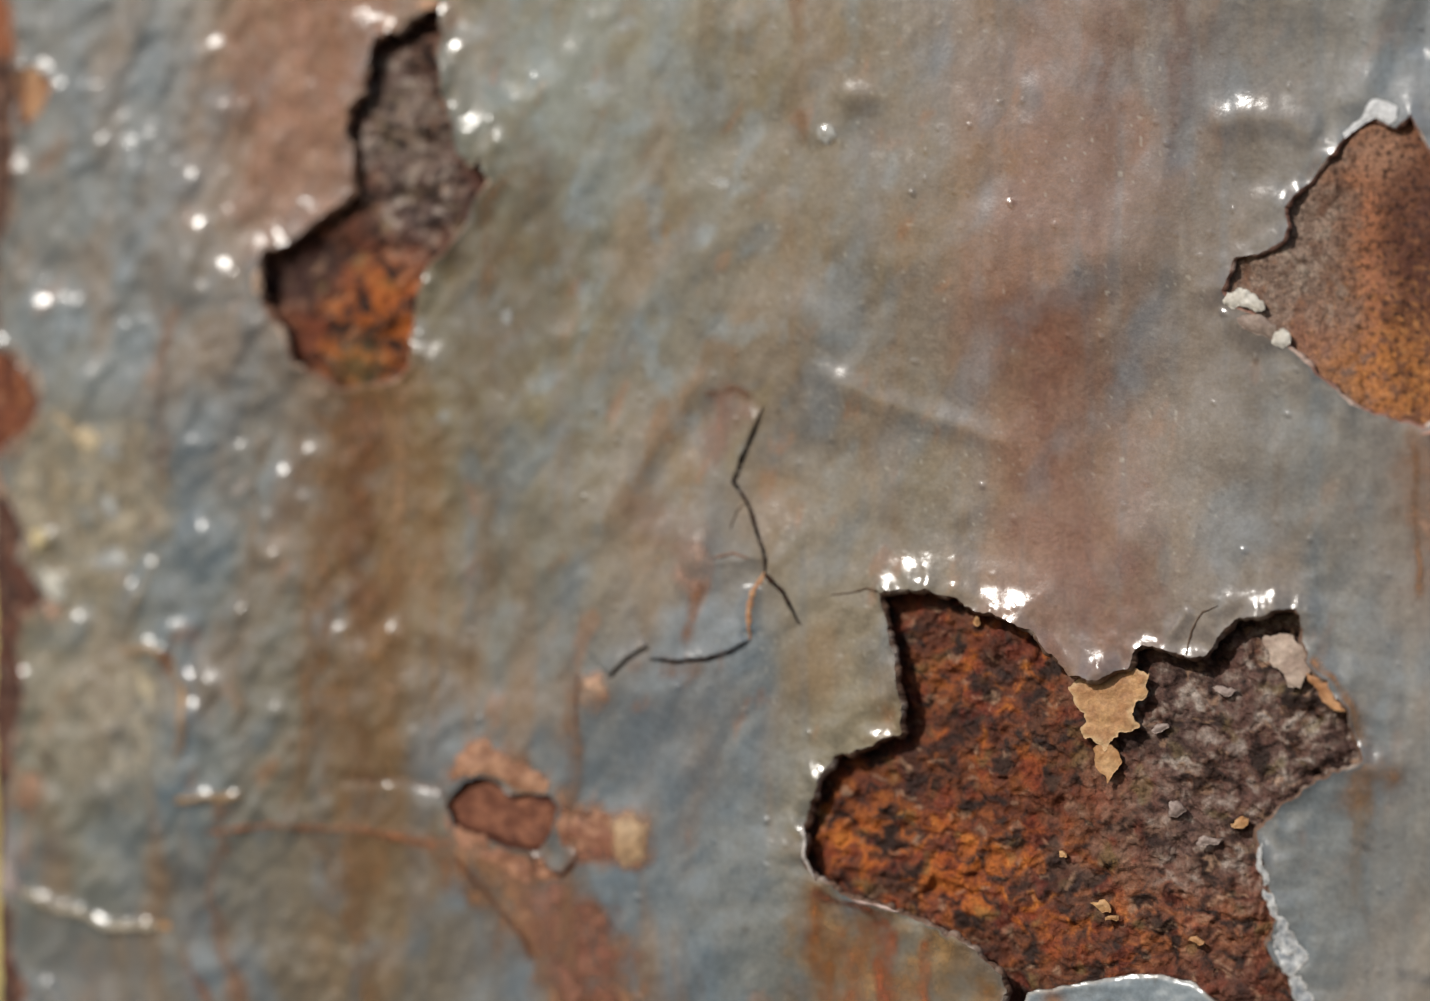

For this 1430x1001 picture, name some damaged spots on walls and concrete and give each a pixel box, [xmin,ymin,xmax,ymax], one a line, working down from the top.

peeling [0,0,52,238]
peeling [252,0,490,391]
peeling [1221,98,1430,430]
peeling [0,346,119,458]
peeling [0,492,66,1001]
peeling [95,549,126,567]
peeling [444,738,647,883]
rust [566,673,607,730]
rust [558,795,647,868]
crack [609,406,801,677]
crack [832,587,878,595]
peeling [800,588,1363,1001]